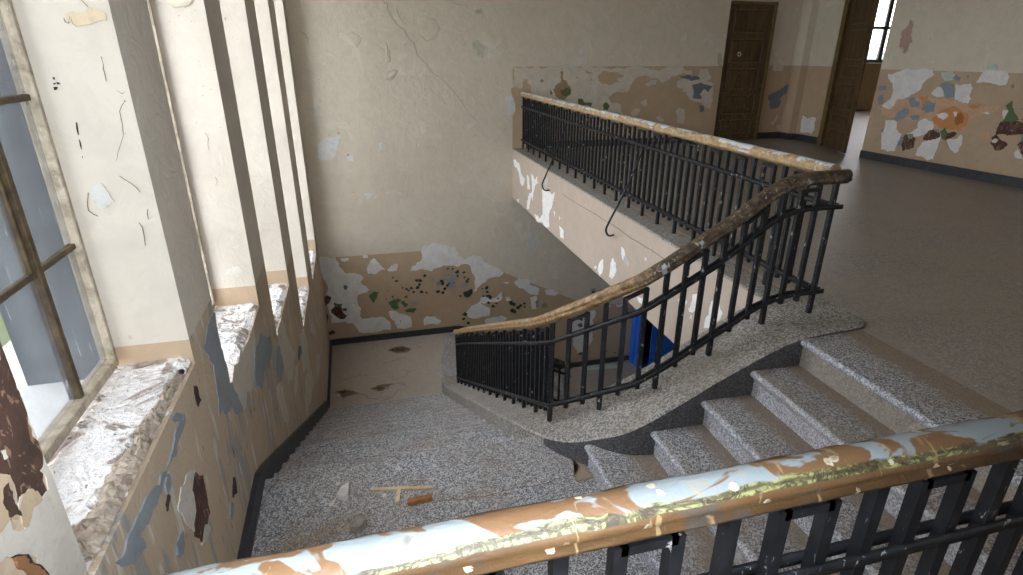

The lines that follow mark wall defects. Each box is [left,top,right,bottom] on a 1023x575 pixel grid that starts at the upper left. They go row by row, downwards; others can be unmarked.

peeling [63,0,107,27]
crack [101,57,149,242]
peeling [317,132,354,162]
peeling [505,63,714,125]
peeling [878,64,1023,160]
peeling [514,159,564,239]
peeling [319,243,559,335]
peeling [594,246,630,279]
peeling [202,312,320,423]
peeling [0,342,211,575]
peeling [229,477,238,520]